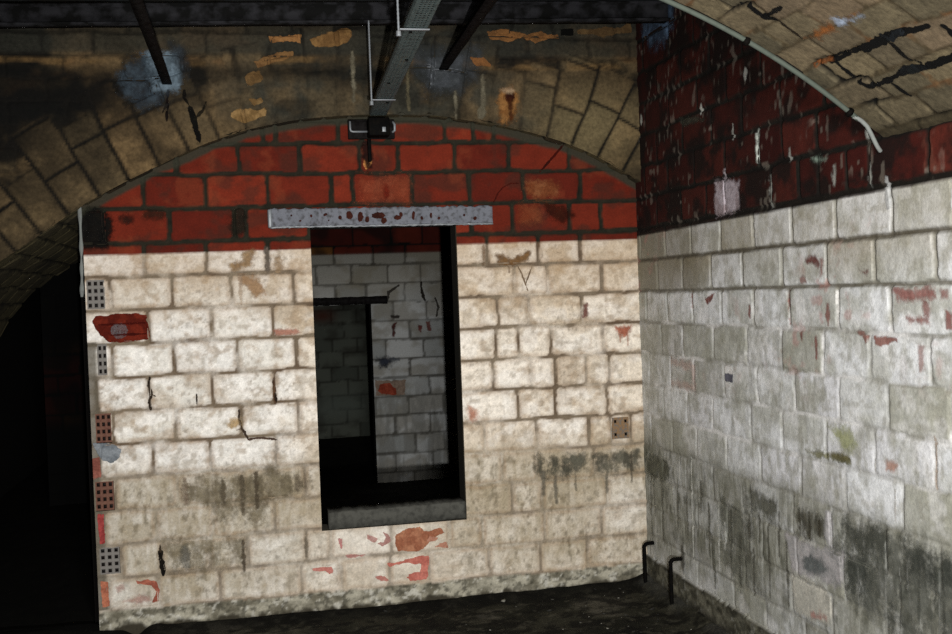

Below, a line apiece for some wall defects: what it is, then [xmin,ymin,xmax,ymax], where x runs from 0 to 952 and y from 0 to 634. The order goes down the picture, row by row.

crack [740,1,803,39]
crack [829,24,952,97]
corrosion [498,88,519,124]
peeling [893,286,947,323]
flaking render [92,313,150,343]
peeling [858,331,897,346]
crack [236,409,277,441]
water stain [184,467,304,519]
water stain [534,449,790,607]
water stain [796,511,825,539]
peeling [367,527,448,581]
water stain [832,523,952,634]